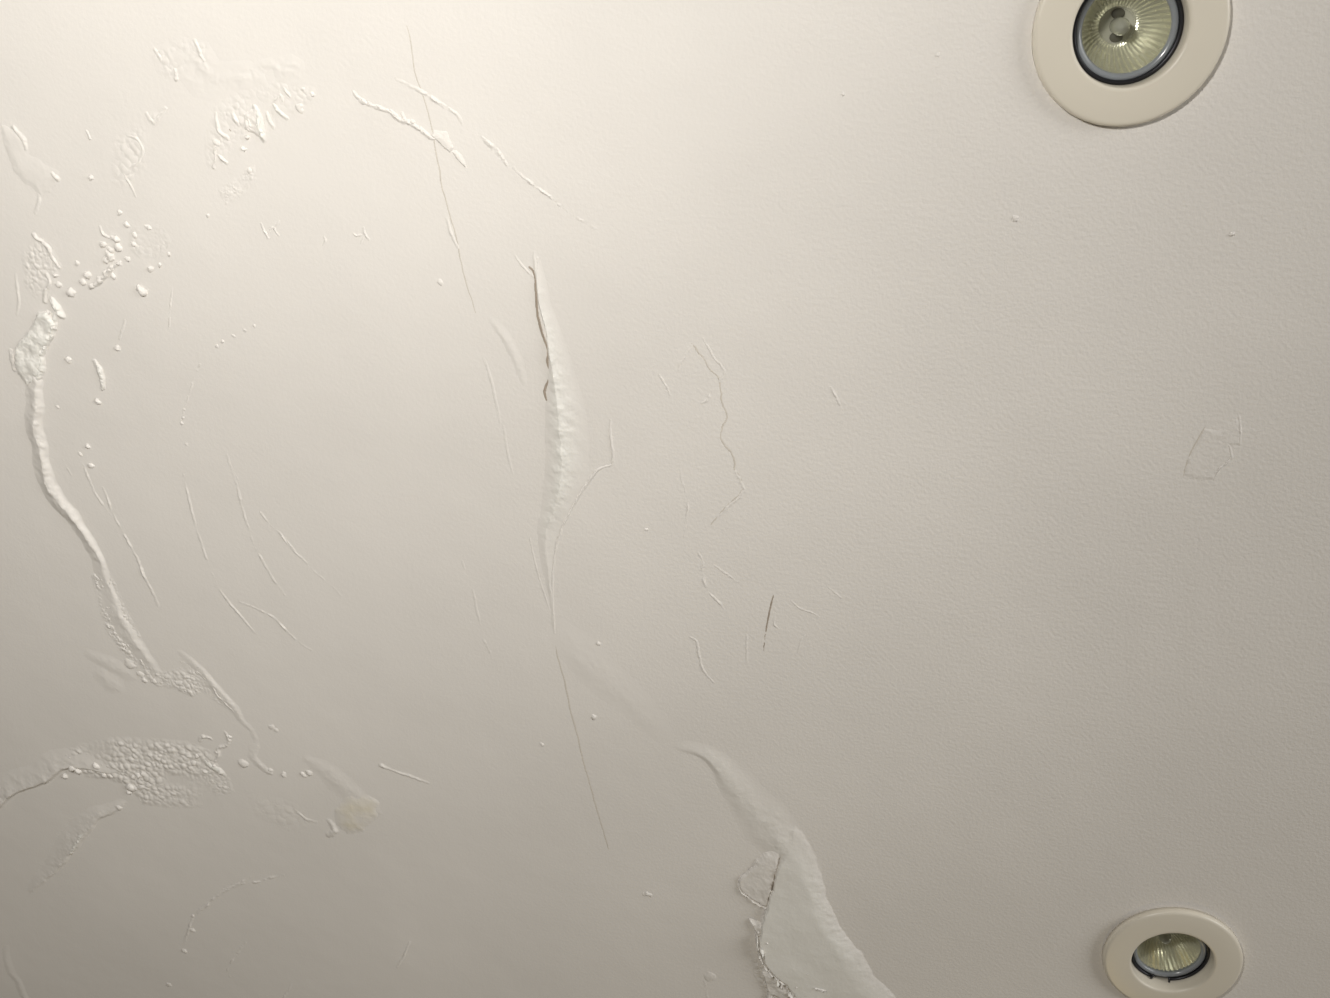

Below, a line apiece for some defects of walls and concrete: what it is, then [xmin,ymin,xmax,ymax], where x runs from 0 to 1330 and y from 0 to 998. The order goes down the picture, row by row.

peeling [8,231,260,745]
peeling [0,736,221,811]